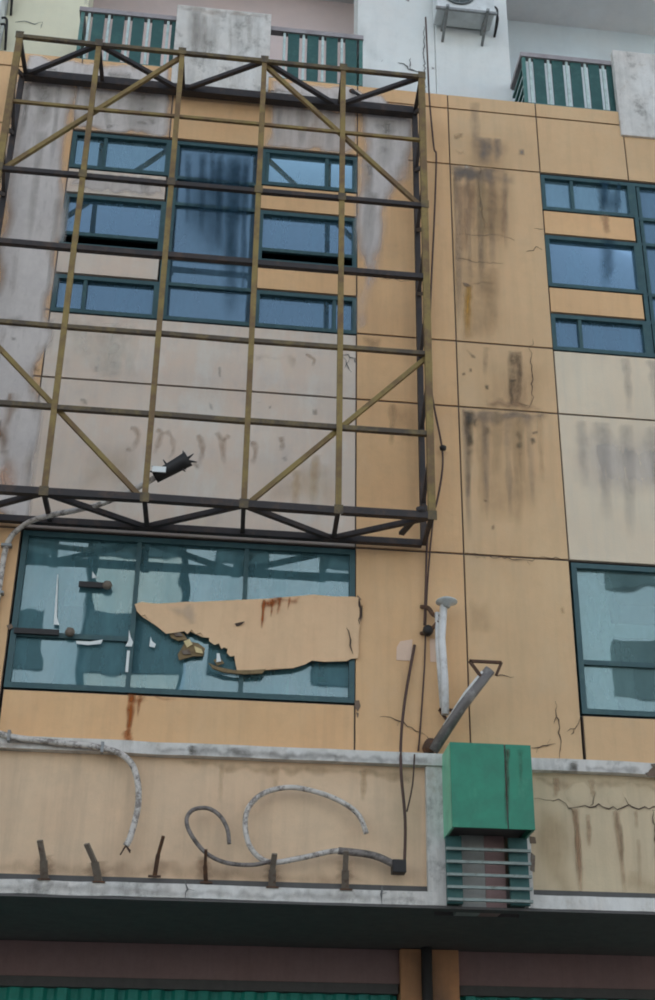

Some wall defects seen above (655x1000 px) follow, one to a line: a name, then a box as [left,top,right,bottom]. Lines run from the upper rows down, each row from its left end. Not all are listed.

damp [201,155,248,257]
peeling [135,595,364,675]
corrosion [261,597,290,624]
corrosion [126,695,141,740]
crack [535,702,581,758]
crack [534,794,655,841]